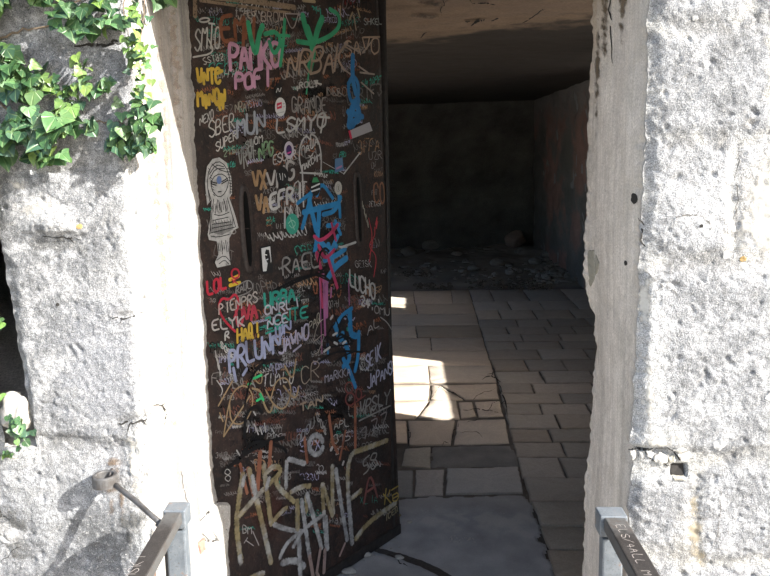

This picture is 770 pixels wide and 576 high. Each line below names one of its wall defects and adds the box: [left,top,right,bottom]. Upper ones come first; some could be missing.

damp [595,0,608,97]
crack [431,370,508,445]
peeling [630,449,652,460]
peeling [668,448,691,463]